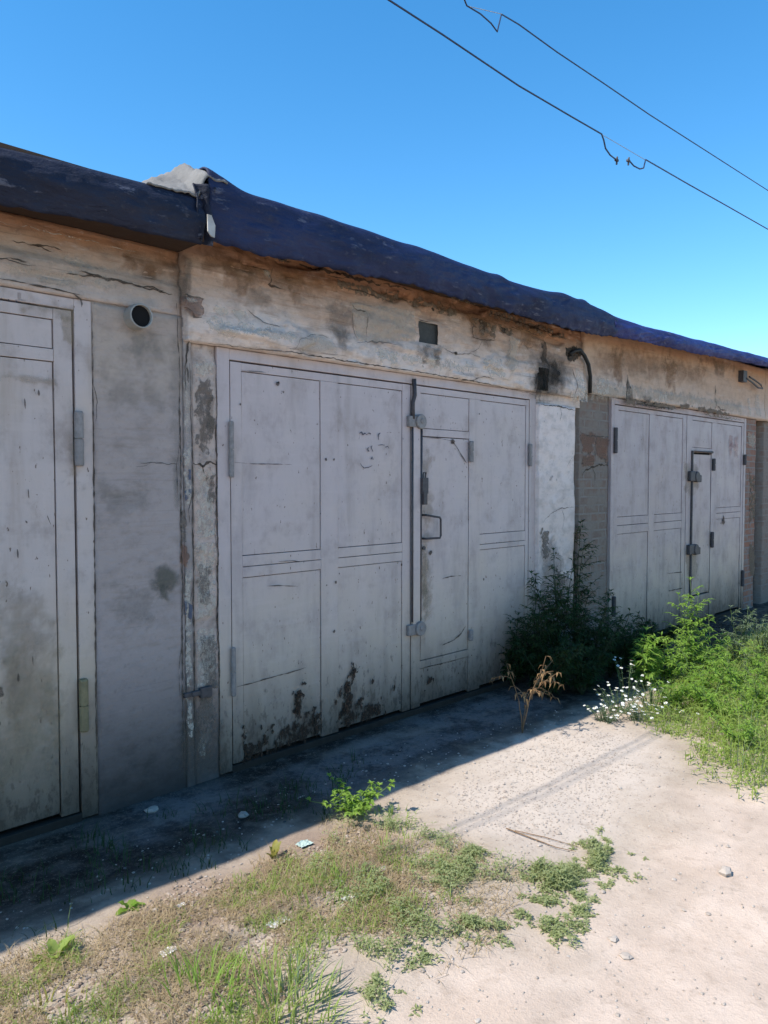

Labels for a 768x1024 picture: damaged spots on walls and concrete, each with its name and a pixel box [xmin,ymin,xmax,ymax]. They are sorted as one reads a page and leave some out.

damp [535,343,560,398]
spalling [580,432,608,467]
crack [0,241,576,768]
damp [156,567,176,599]
peeling [180,363,218,756]
rust [238,667,323,764]
rust [335,662,386,728]